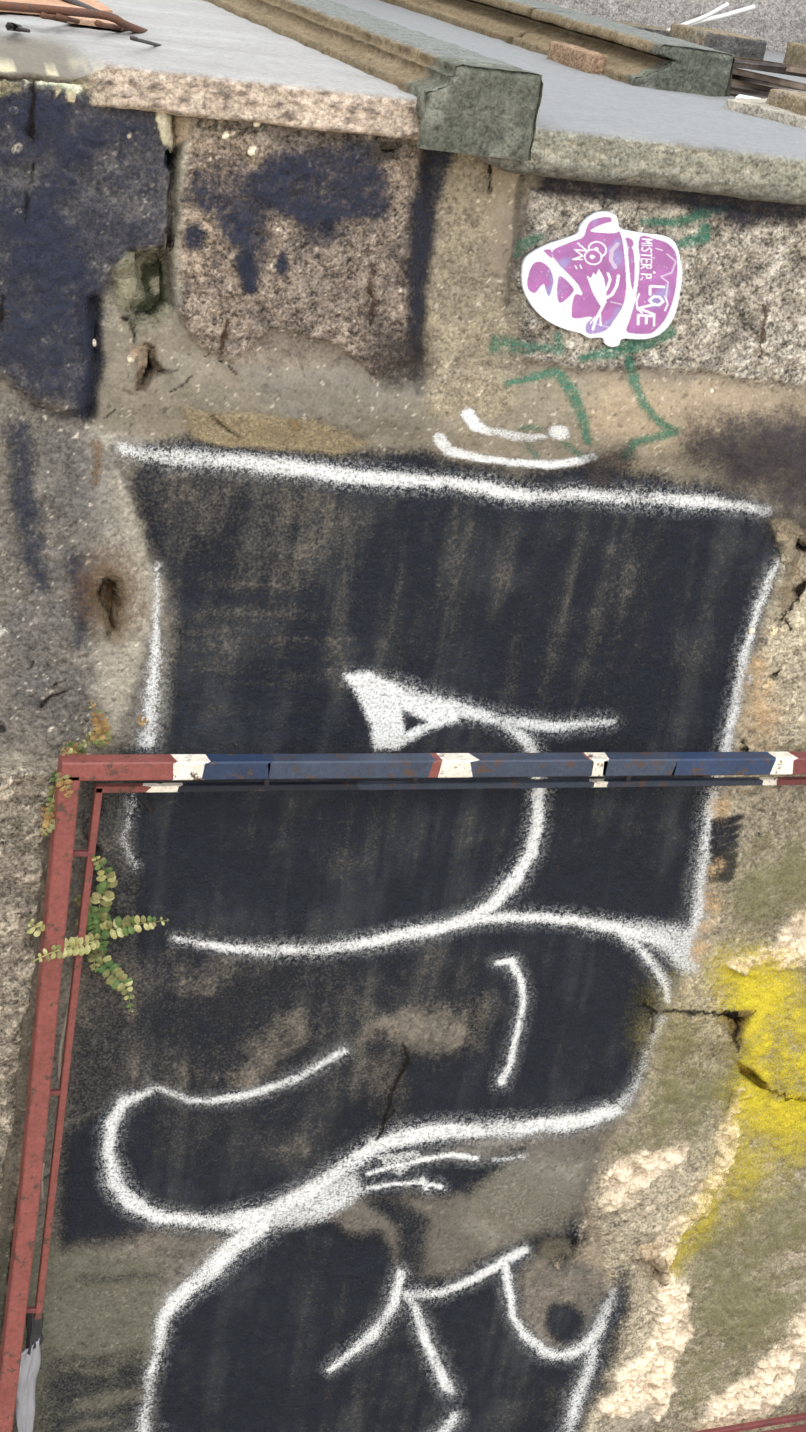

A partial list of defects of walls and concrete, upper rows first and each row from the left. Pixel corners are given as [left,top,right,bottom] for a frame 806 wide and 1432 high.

spalling [113,245,174,390]
spalling [94,571,128,641]
crack [746,539,806,690]
crack [740,738,749,752]
crack [375,1041,411,1141]
crack [642,1002,806,1102]